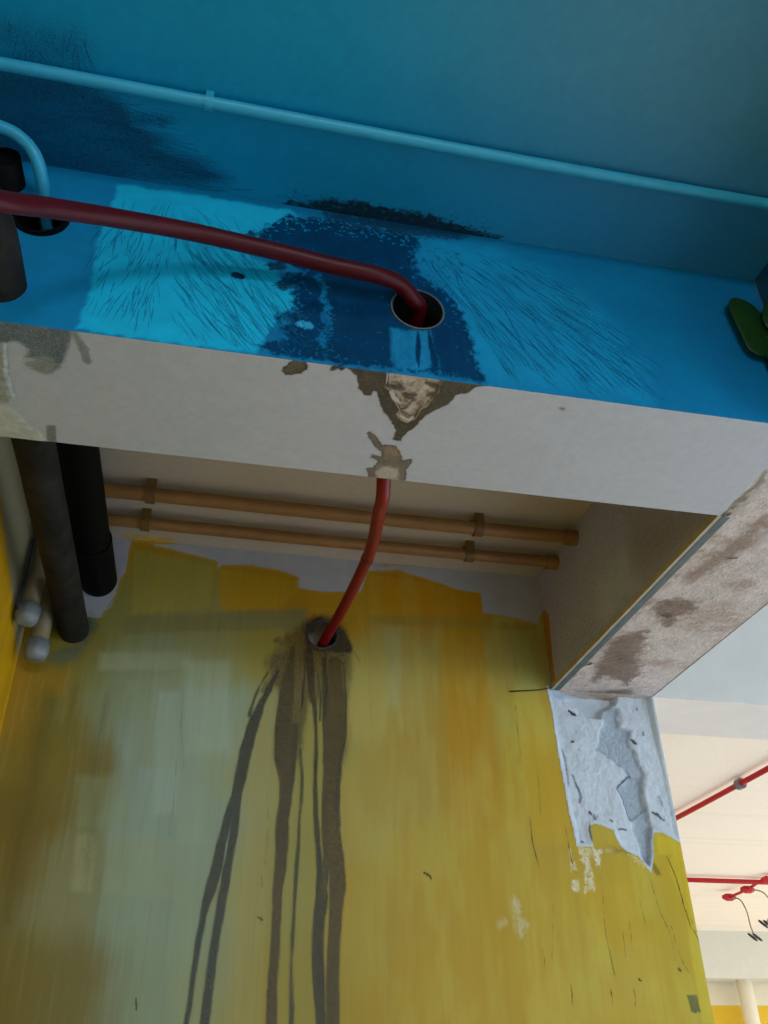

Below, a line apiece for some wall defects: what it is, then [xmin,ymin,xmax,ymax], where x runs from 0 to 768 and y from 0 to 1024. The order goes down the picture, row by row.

leakage [0,71,256,192]
leakage [244,183,502,385]
flaking render [329,366,484,481]
leakage [183,612,363,1024]
flaking render [546,663,681,894]